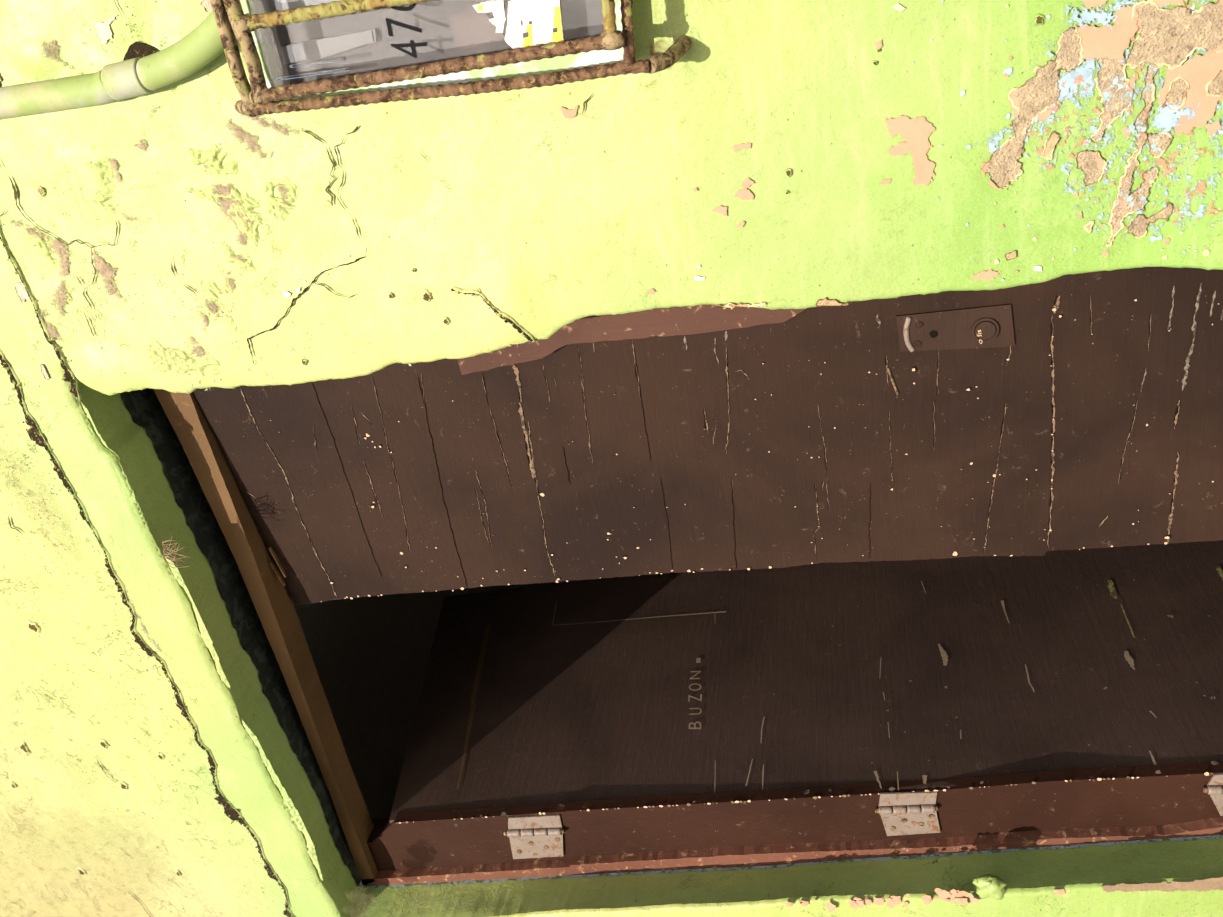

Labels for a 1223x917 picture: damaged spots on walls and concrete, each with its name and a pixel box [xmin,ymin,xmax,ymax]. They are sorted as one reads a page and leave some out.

flaking render [200,0,213,14]
peeling [884,115,935,186]
peeling [975,0,1223,247]
crack [0,165,118,401]
crack [247,126,367,364]
crack [451,287,538,343]
peeling [972,251,1016,280]
crack [0,348,296,917]
peeling [1099,877,1223,893]